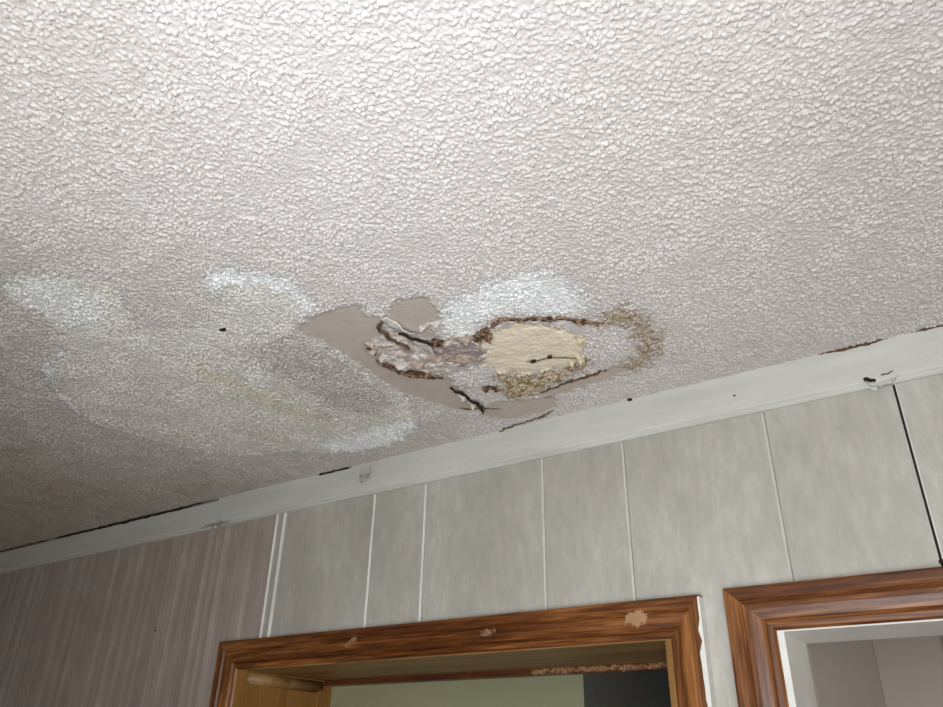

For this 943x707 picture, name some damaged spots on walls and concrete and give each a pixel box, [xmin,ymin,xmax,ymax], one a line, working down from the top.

leakage [1,262,423,456]
peeling [298,296,631,421]
crack [0,500,211,552]